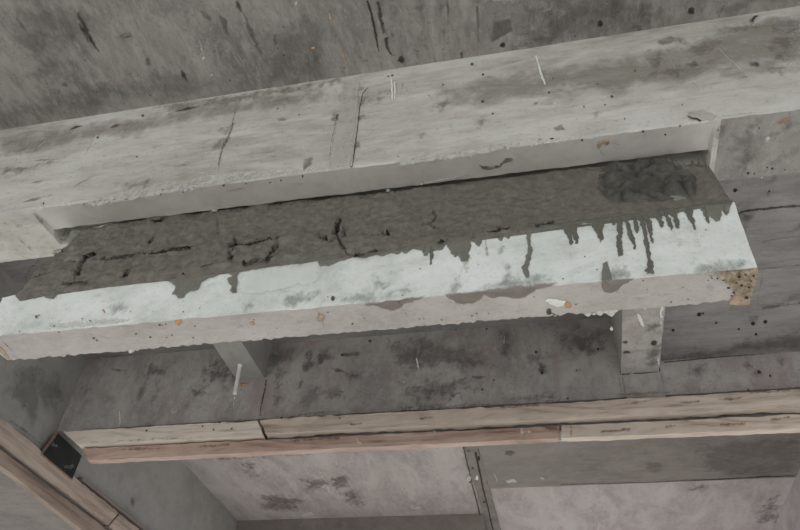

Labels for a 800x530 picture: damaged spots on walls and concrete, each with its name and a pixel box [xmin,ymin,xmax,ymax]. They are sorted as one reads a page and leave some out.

crack [350,89,366,167]
damp [16,158,732,304]